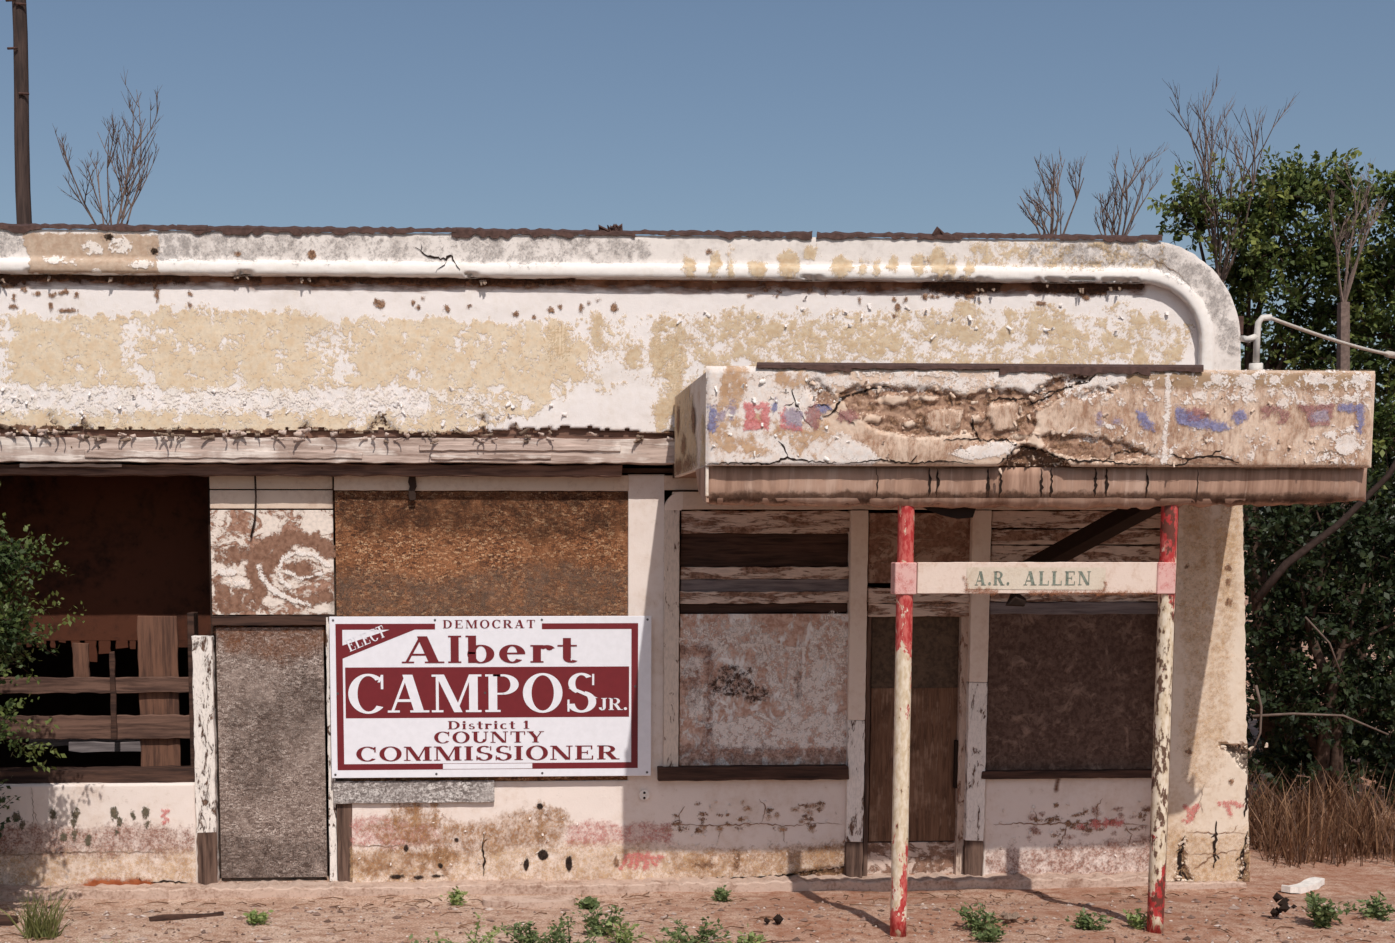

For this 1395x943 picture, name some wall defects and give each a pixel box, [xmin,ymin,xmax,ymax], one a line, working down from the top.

peeling [0,231,1374,476]
crack [709,374,1239,466]
peeling [213,530,336,616]
spalling [1221,742,1268,774]
spalling [1175,838,1191,881]
crack [1175,784,1249,881]
spalling [1239,837,1250,882]